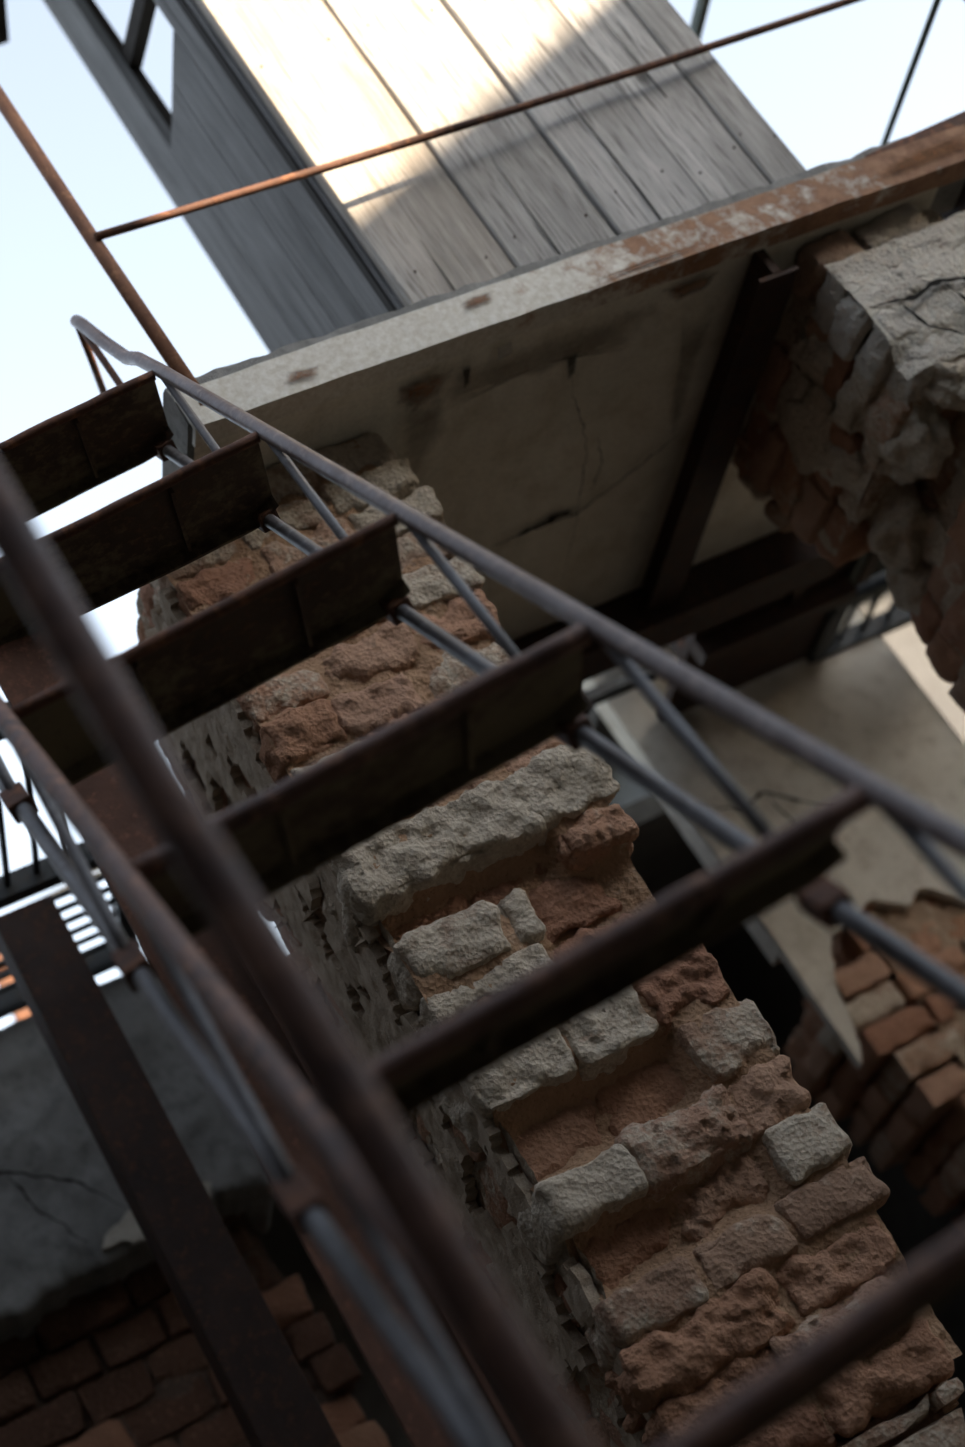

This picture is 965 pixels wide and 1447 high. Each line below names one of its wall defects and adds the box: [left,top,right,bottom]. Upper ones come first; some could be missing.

corrosion [885,138,965,175]
corrosion [465,293,490,307]
crack [490,432,682,547]
crack [0,1171,130,1243]